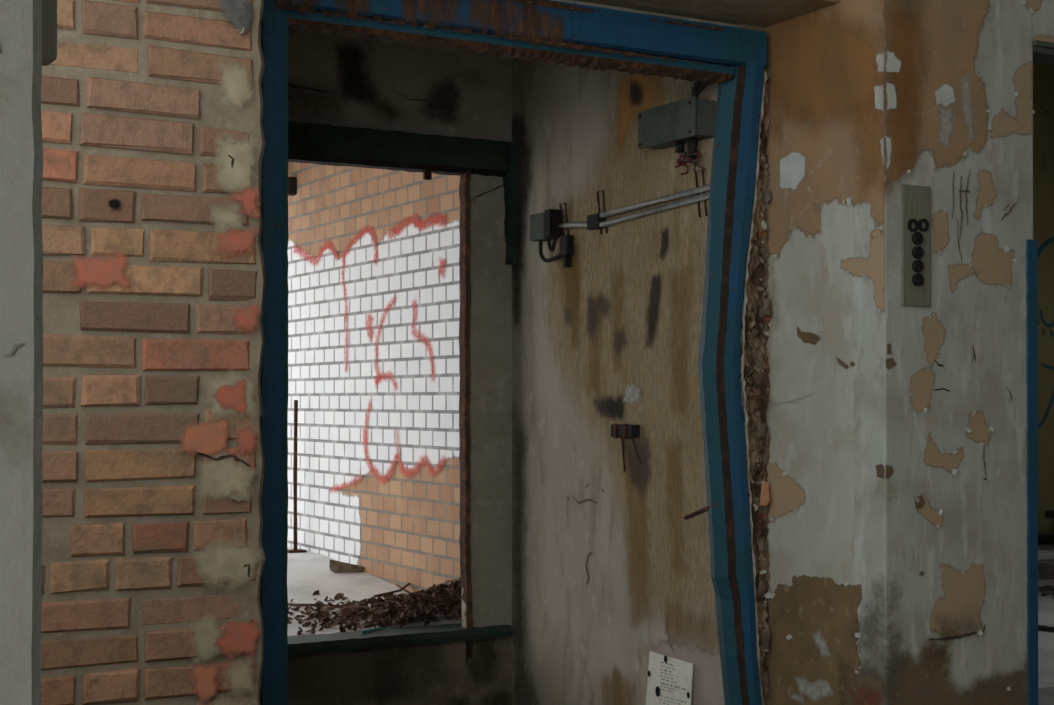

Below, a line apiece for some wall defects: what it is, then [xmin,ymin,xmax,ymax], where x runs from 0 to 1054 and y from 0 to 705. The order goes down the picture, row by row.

corrosion [279,6,673,60]
corrosion [513,0,598,12]
peeling [740,0,1035,705]
flaking render [647,641,725,705]